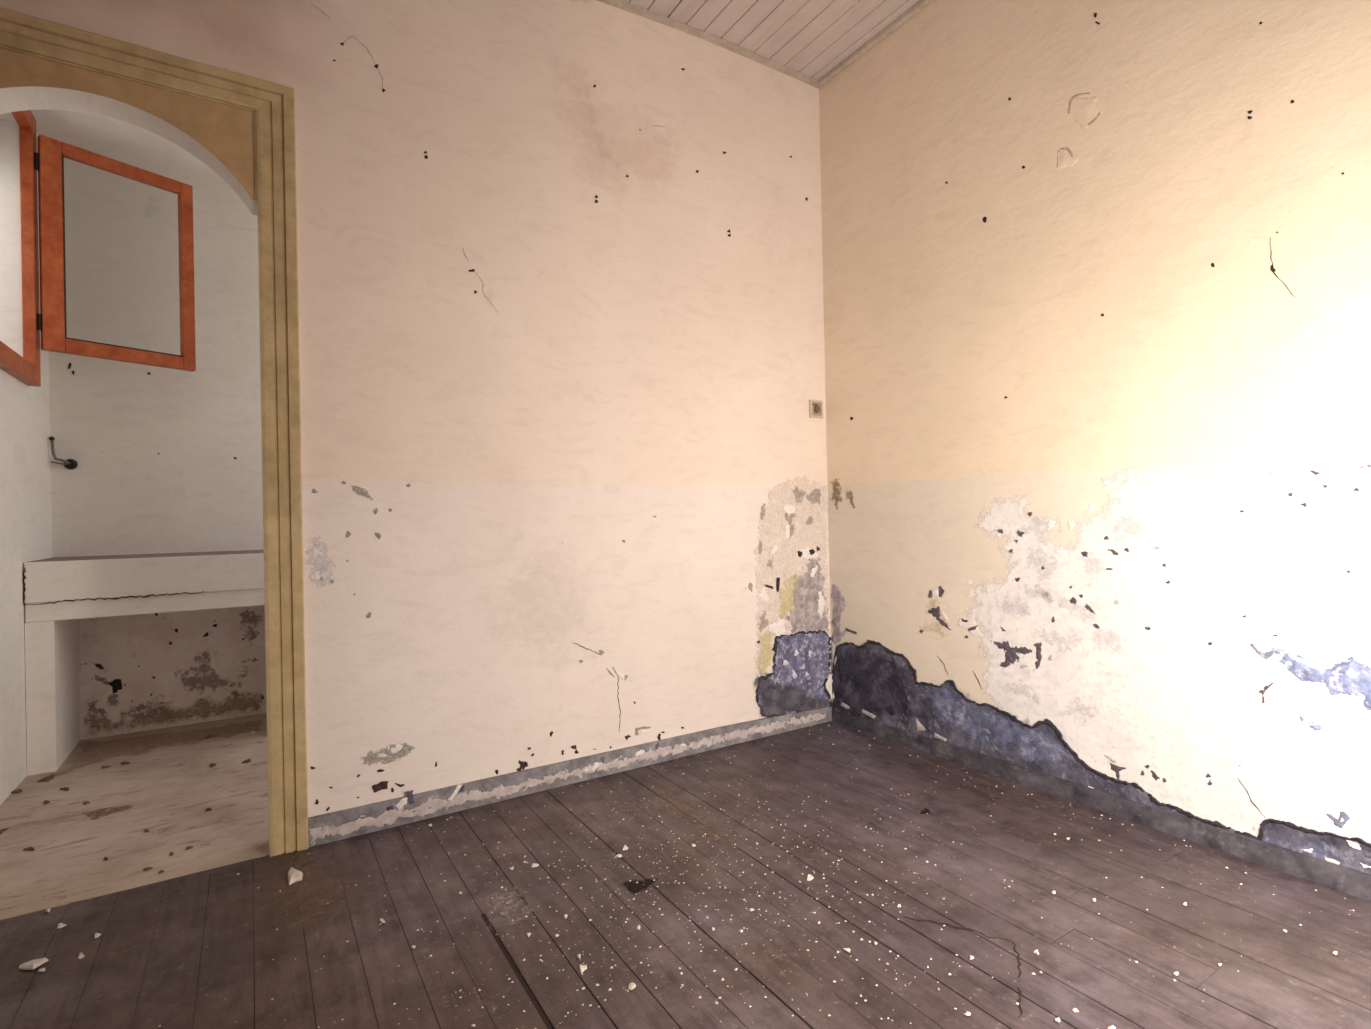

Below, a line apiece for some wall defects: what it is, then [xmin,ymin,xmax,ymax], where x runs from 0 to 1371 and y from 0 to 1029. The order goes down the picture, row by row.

crack [310,1,386,92]
crack [462,247,499,313]
crack [1270,232,1296,298]
damp [88,652,261,730]
damp [240,610,261,642]
peeling [307,452,1371,874]